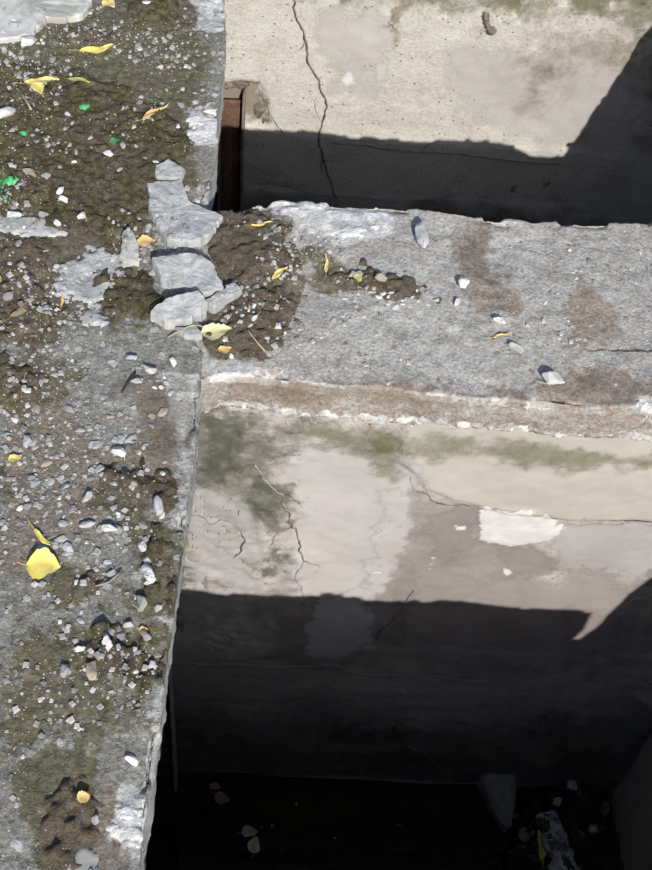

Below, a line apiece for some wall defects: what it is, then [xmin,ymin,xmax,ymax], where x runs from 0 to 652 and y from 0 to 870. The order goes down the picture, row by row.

damp [488,0,519,9]
damp [573,0,609,16]
flaking render [224,80,271,124]
crack [243,0,560,208]
damp [450,49,635,152]
crack [594,347,652,355]
damp [635,398,652,423]
crack [191,515,246,558]
crack [254,465,320,617]